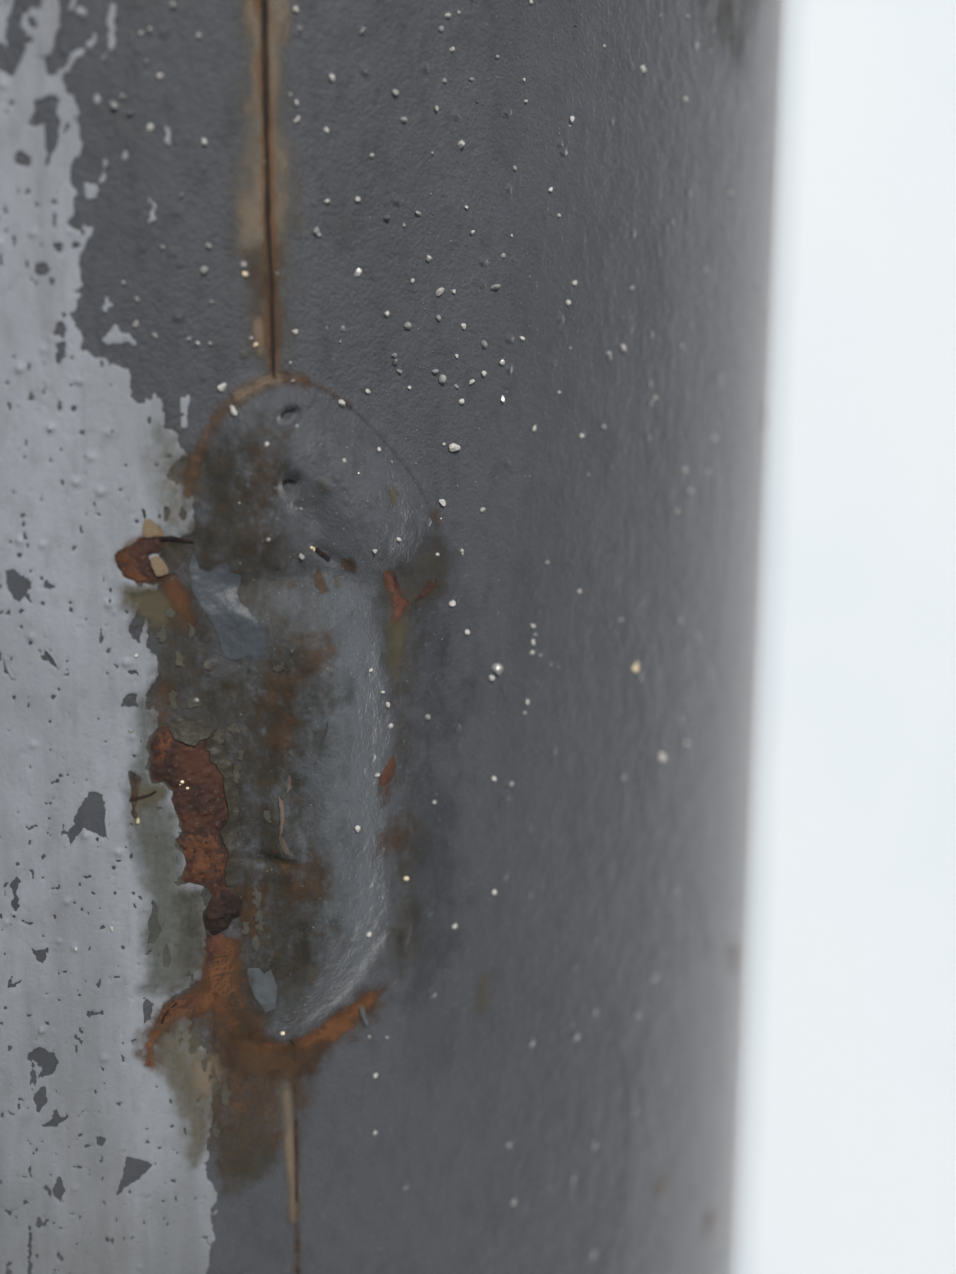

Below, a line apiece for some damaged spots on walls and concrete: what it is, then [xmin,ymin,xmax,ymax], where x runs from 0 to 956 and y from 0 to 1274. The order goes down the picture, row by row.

crack [261,0,275,377]
corrosion [173,0,348,496]
peeling [5,569,32,602]
spalling [115,509,189,585]
corrosion [123,579,192,625]
corrosion [315,559,356,592]
peeling [67,791,110,846]
spalling [130,716,243,979]
corrosion [136,801,385,1080]
peeling [27,1047,68,1127]
corrosion [286,1136,299,1183]
crack [290,1040,300,1274]